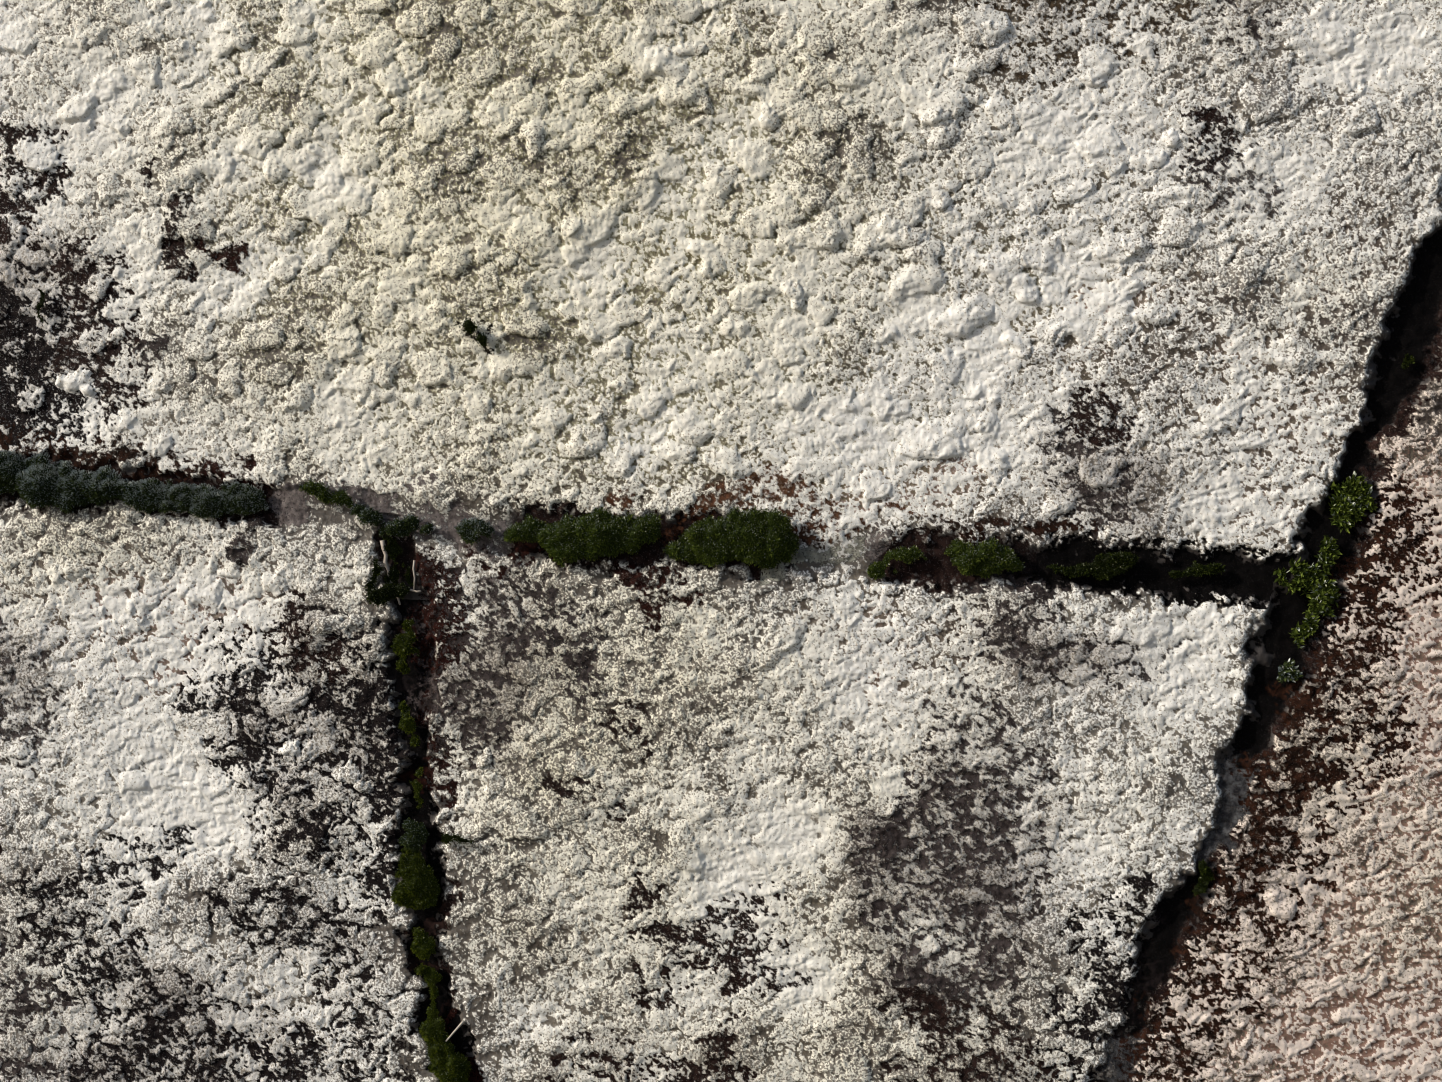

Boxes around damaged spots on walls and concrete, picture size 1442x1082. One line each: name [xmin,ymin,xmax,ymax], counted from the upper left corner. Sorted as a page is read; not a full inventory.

water stain [140,157,156,188]
water stain [161,190,249,287]
water stain [118,331,175,369]
crack [0,444,281,530]
crack [512,496,794,582]
crack [878,229,1442,1082]
water stain [0,556,653,1082]
crack [374,531,479,1082]
water stain [847,569,1193,1082]